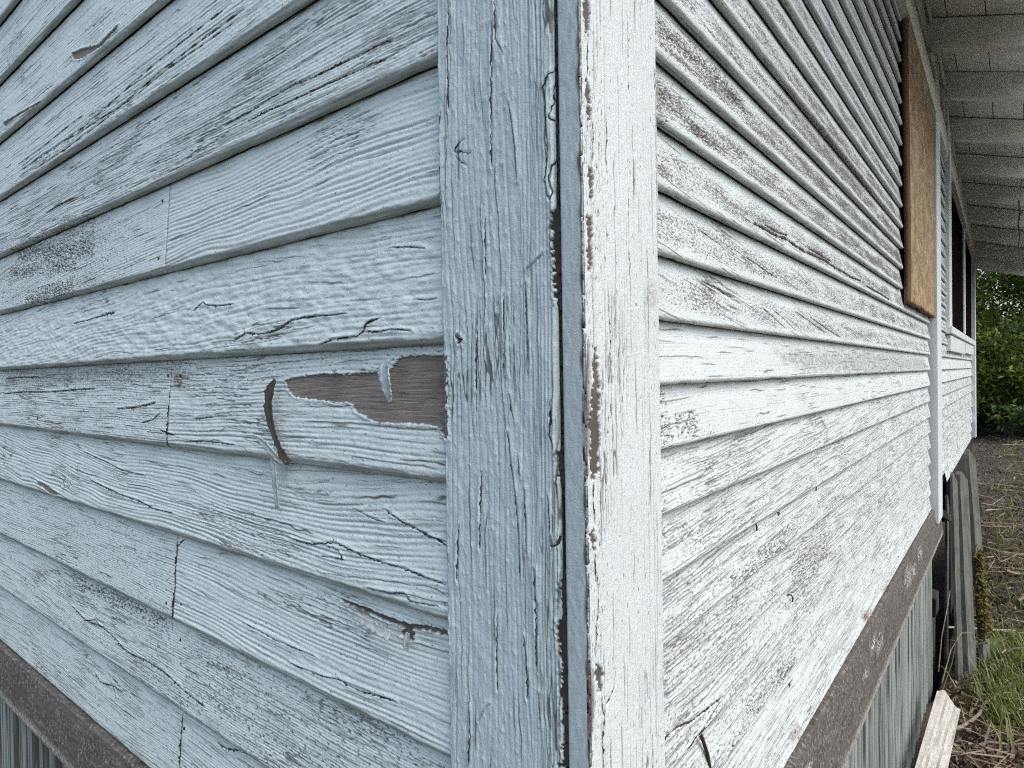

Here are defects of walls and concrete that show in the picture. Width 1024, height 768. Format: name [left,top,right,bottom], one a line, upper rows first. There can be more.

peeling [73,29,116,59]
crack [489,0,516,173]
crack [542,70,559,200]
crack [235,313,410,343]
crack [118,393,233,448]
peeling [287,354,448,438]
peeling [587,350,599,479]
crack [171,540,184,619]
crack [293,475,482,606]
crack [507,397,566,724]
crack [72,607,203,766]
crack [245,623,394,701]